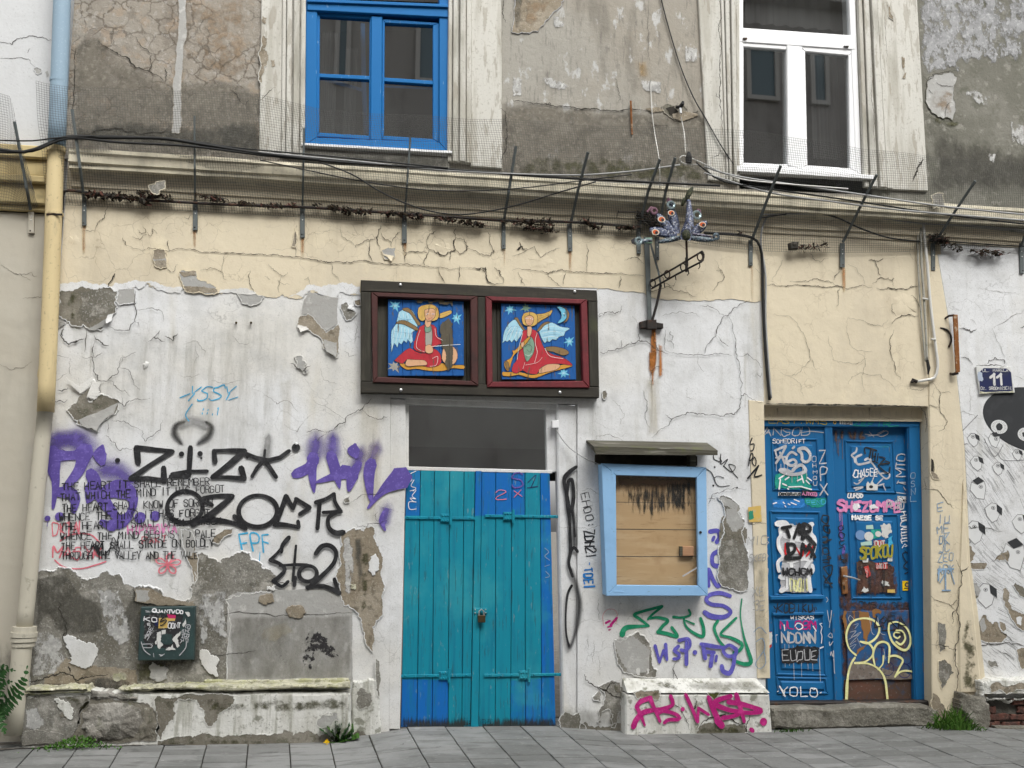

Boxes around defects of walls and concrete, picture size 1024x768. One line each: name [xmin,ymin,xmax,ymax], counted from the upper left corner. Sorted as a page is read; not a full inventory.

water stain [74,38,260,159]
peeling [66,377,120,432]
peeling [58,286,136,331]
peeling [296,292,361,359]
crack [122,227,1024,443]
corrosion [649,330,662,383]
peeling [716,495,750,593]
peeling [20,526,339,747]
peeling [335,526,386,710]
peeling [559,630,661,731]
crack [931,565,1023,691]
peeling [979,582,1024,644]